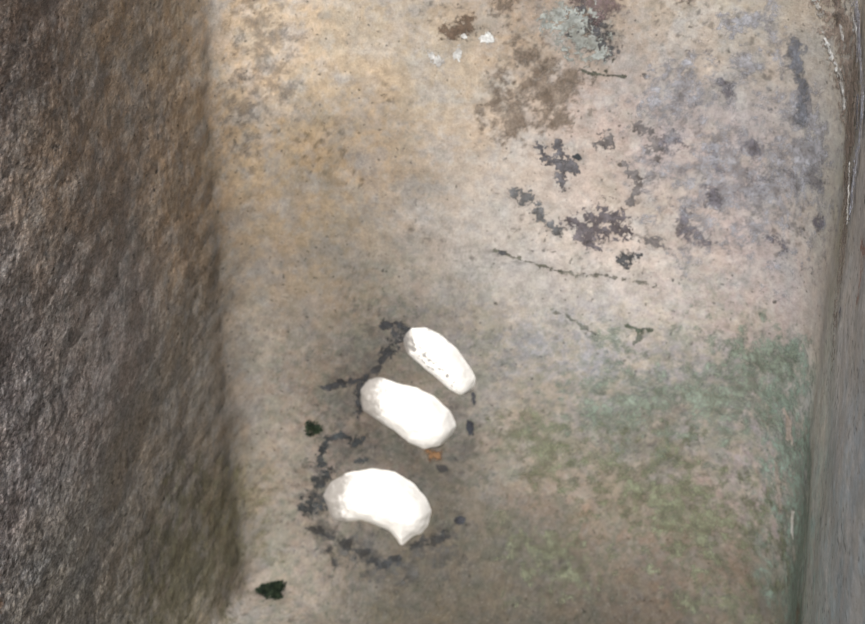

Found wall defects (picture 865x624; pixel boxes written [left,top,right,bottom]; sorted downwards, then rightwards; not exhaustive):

damp [438,12,483,40]
damp [490,0,517,16]
damp [565,0,621,62]
damp [476,35,594,146]
damp [637,0,834,275]
crack [492,249,657,288]